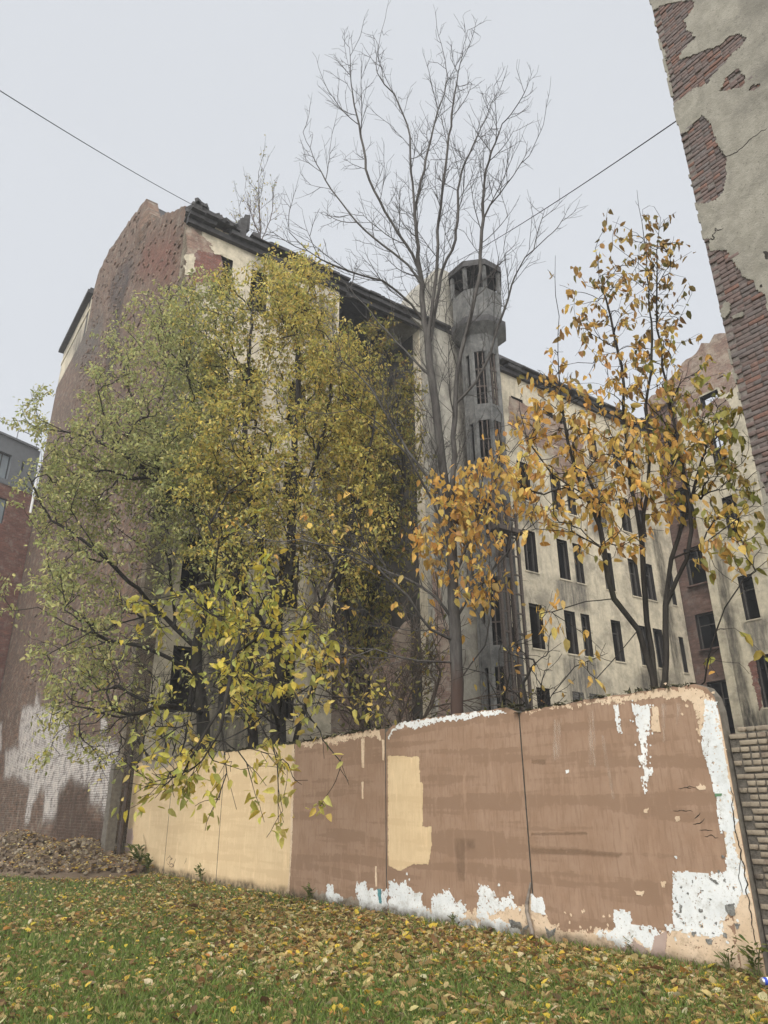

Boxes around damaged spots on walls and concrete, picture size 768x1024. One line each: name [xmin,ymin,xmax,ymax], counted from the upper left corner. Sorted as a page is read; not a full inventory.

spalling [183,227,224,301]
spalling [680,116,727,204]
spalling [654,0,760,105]
spalling [676,238,768,493]
spalling [286,572,506,893]
peeling [312,683,766,976]